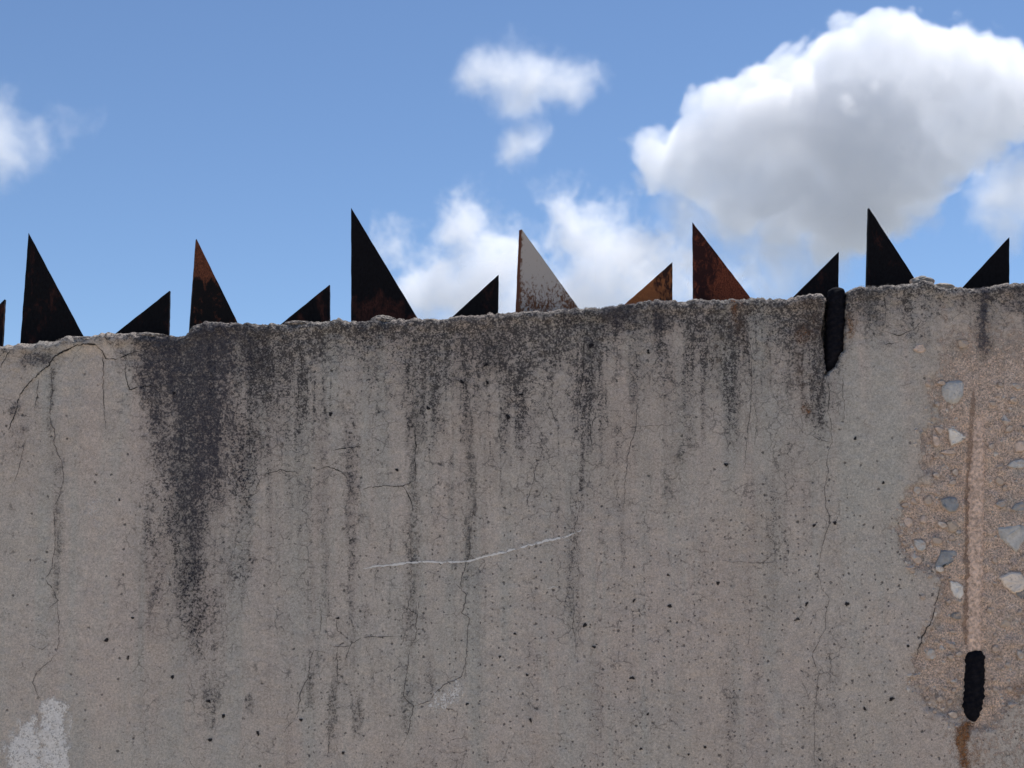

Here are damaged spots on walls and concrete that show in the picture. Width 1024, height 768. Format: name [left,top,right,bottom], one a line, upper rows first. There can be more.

crack [8,343,152,698]
water stain [120,321,276,655]
water stain [344,406,360,516]
water stain [406,333,421,630]
crack [285,498,581,745]
water stain [460,413,476,585]
crack [579,338,596,453]
water stain [560,300,674,383]
spalling [892,321,1024,768]